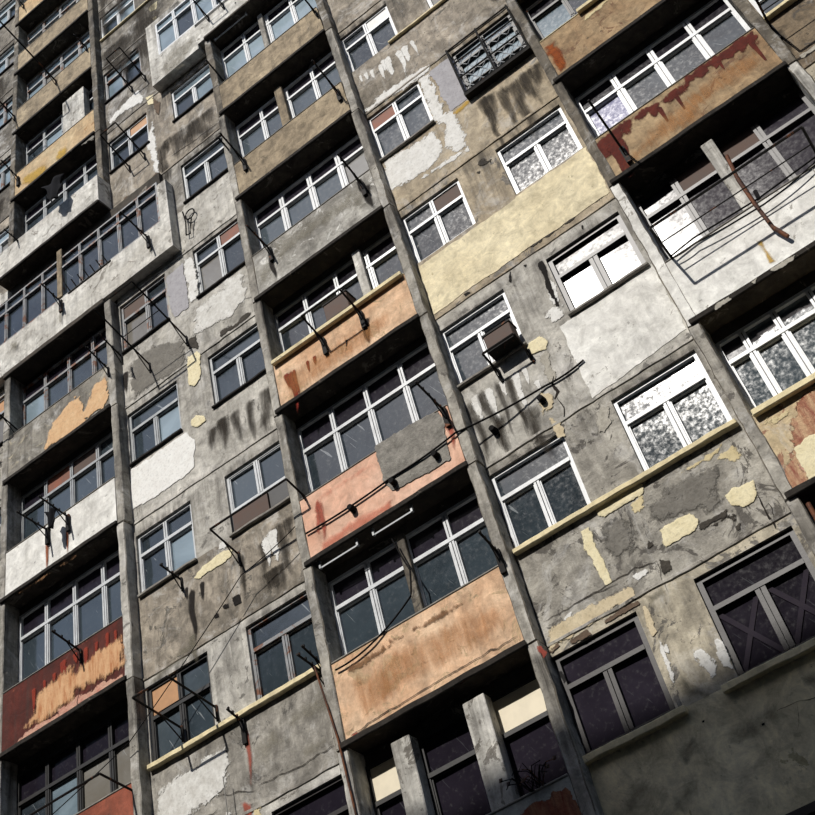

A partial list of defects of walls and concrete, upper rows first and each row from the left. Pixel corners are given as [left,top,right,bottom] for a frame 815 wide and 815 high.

peeling [359,40,470,190]
damp [479,63,541,140]
peeling [597,31,766,176]
peeling [44,378,109,450]
peeling [130,432,195,510]
damp [209,388,271,445]
rust [284,370,300,408]
spalling [601,444,742,557]
peeling [761,389,815,488]
peeling [262,529,280,566]
peeling [16,635,125,750]
peeling [157,746,230,815]